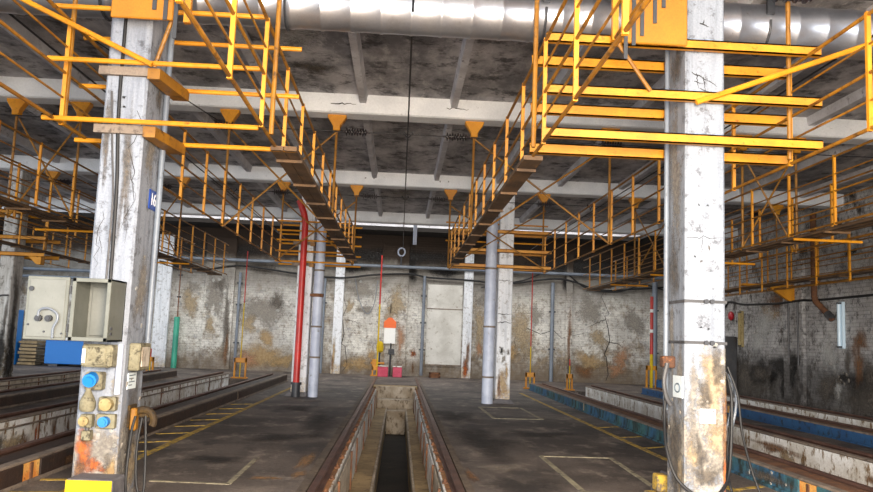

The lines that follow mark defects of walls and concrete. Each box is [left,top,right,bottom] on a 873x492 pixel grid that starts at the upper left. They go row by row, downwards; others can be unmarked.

crack [692,72,717,92]
leakage [239,331,293,367]
leakage [331,344,375,370]
crack [497,294,623,380]
leakage [819,332,873,404]
rust [67,436,106,475]